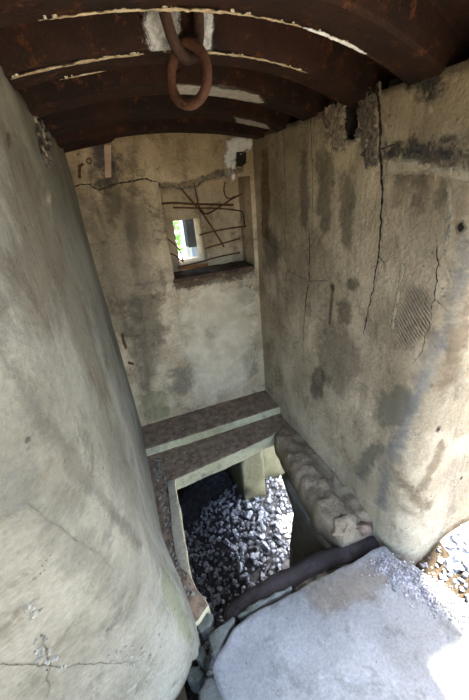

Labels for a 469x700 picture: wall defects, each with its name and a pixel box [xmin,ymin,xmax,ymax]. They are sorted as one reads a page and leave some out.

crack [74,178,196,191]
spalling [159,149,249,270]
spalling [323,86,380,169]
crack [363,81,400,336]
damp [383,134,469,170]
crack [414,248,447,362]
crack [0,634,154,697]